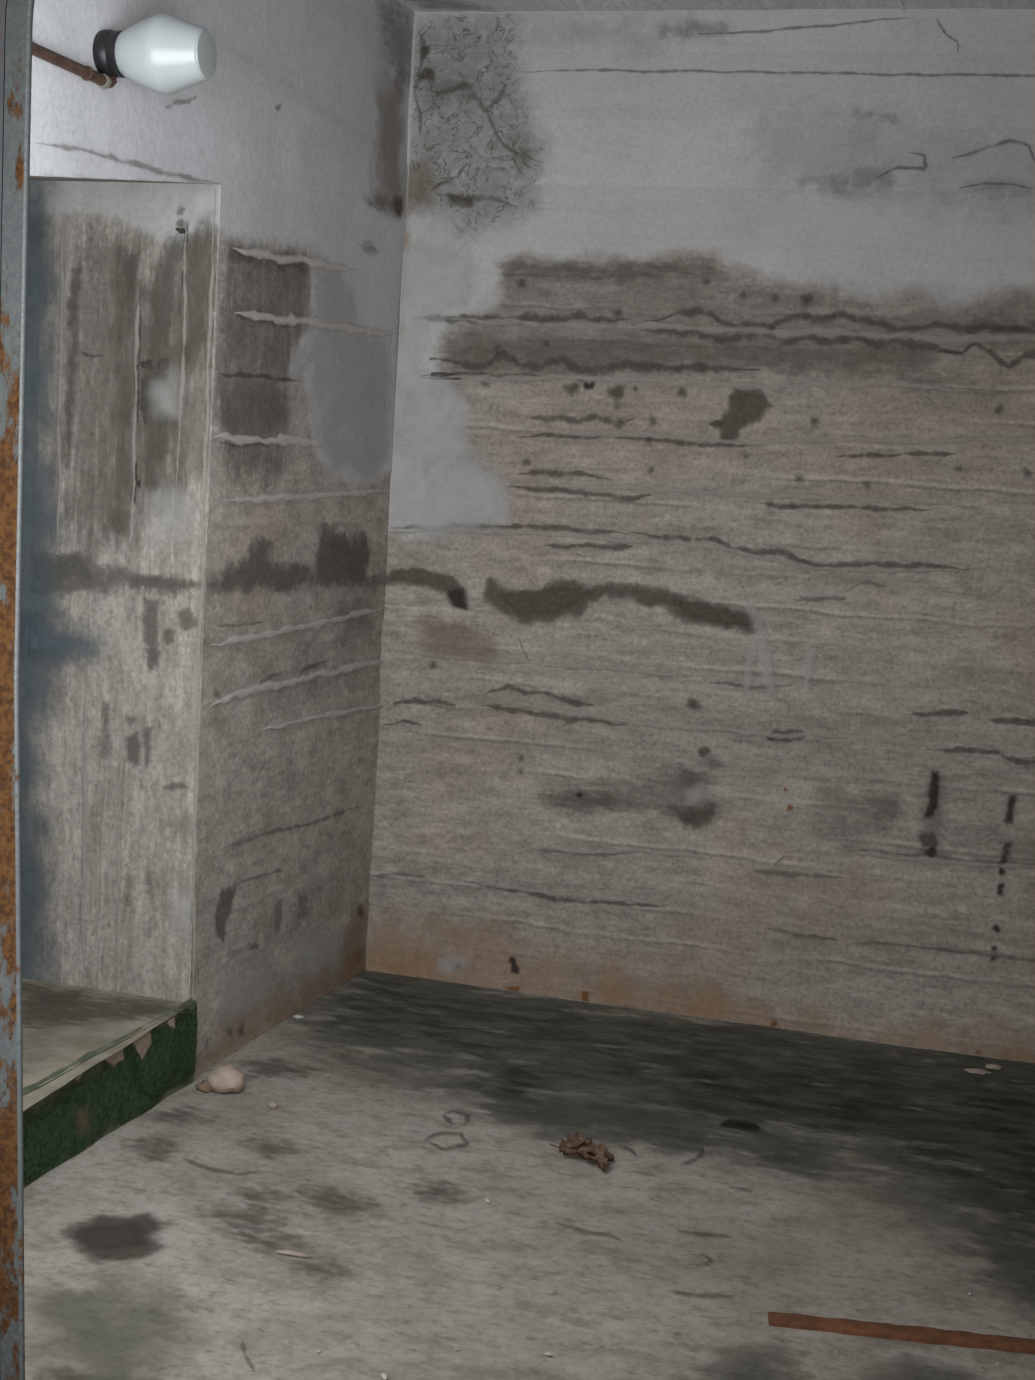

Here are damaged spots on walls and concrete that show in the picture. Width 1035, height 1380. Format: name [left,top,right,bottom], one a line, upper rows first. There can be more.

crack [412,16,541,226]
damp [66,271,101,446]
damp [141,249,176,482]
crack [222,372,300,381]
damp [35,529,467,610]
damp [484,578,755,632]
damp [919,772,938,857]
damp [1004,796,1015,823]
damp [997,843,1010,895]
damp [323,970,1035,1220]
damp [68,1213,163,1259]